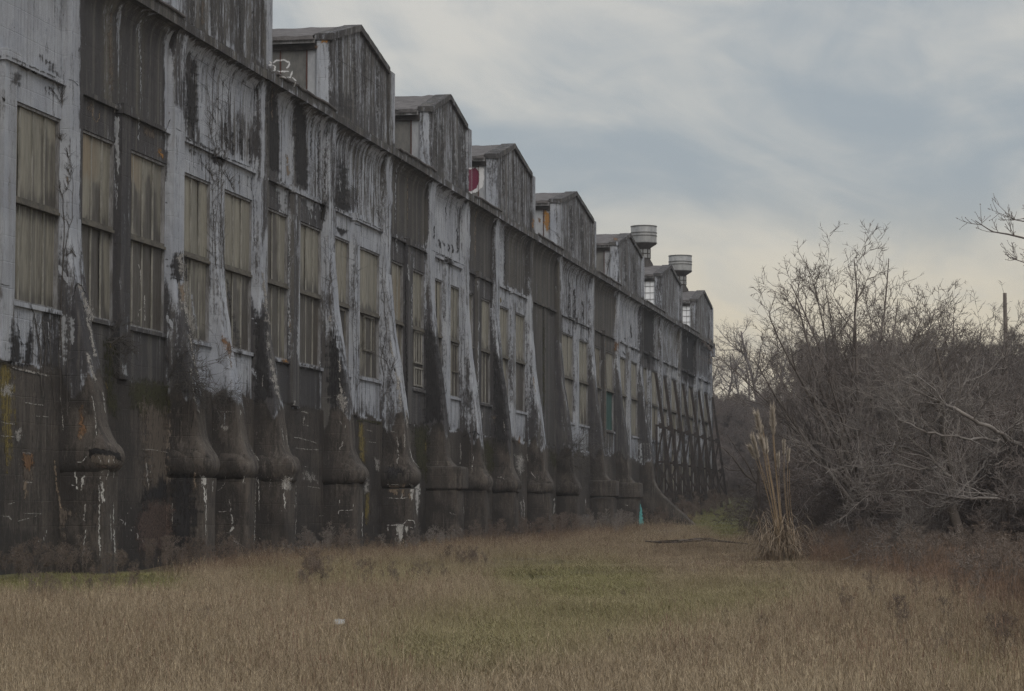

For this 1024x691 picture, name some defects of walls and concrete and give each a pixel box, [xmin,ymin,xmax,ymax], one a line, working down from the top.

peeling [59,283,97,381]